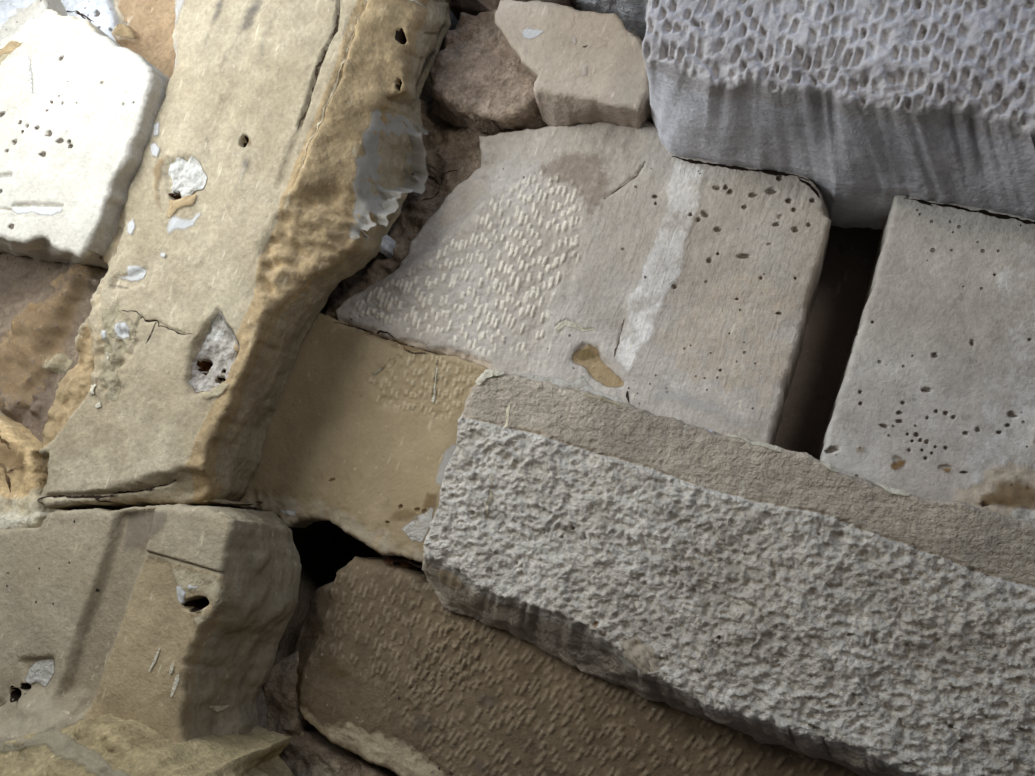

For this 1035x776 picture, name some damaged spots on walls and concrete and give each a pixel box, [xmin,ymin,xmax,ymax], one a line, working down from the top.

spalling [151,123,207,232]
crack [111,310,192,344]
spalling [188,310,239,398]
crack [0,436,14,492]
crack [37,480,177,503]
water stain [982,483,1035,508]
spalling [20,659,54,694]